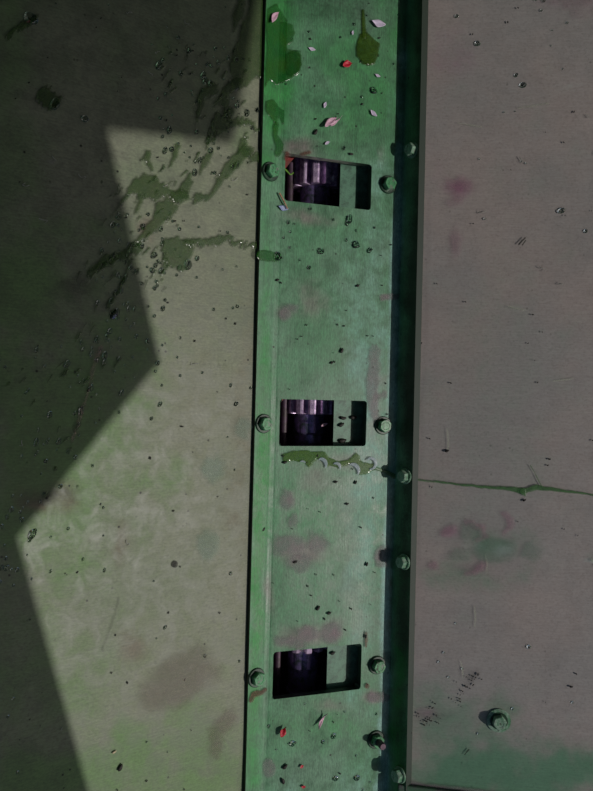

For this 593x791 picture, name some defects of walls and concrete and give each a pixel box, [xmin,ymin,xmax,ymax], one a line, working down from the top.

leakage [77,0,302,312]
leakage [283,450,396,479]